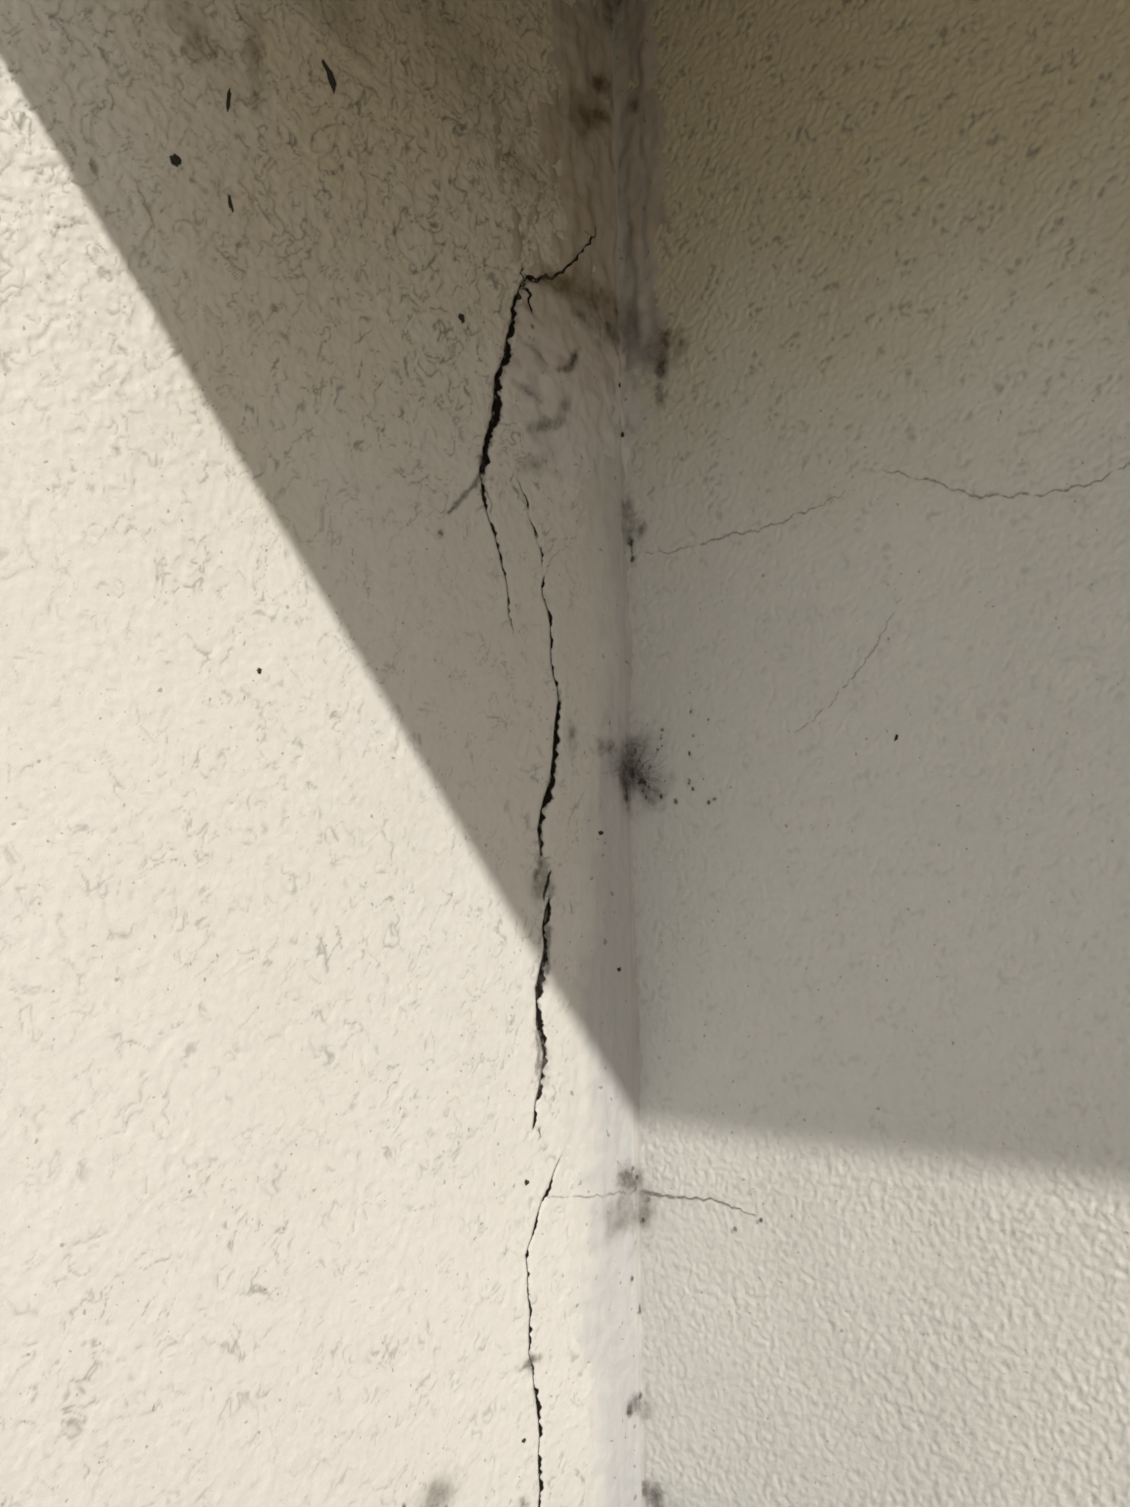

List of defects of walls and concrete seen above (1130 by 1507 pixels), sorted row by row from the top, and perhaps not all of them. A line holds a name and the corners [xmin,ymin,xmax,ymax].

water stain [609,728,677,804]
crack [439,227,596,1507]
crack [646,1191,755,1215]